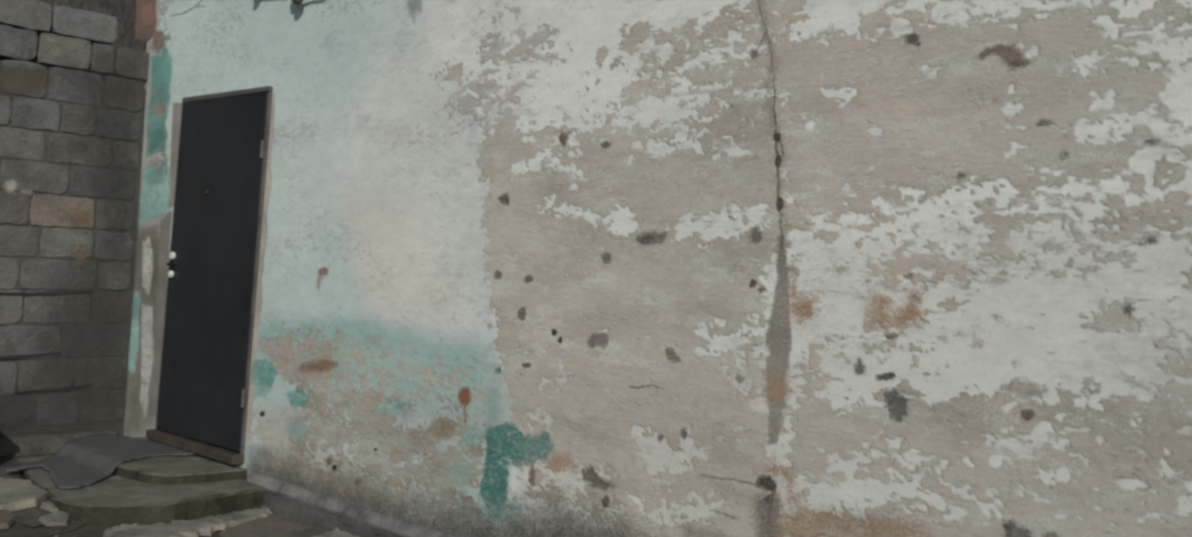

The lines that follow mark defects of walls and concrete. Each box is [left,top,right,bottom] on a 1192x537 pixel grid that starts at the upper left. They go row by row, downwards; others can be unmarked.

crack [752,0,793,257]
peeling [429,0,1192,537]
peeling [250,323,379,445]
rust [424,386,473,441]
damp [239,427,739,537]
crack [701,474,836,537]